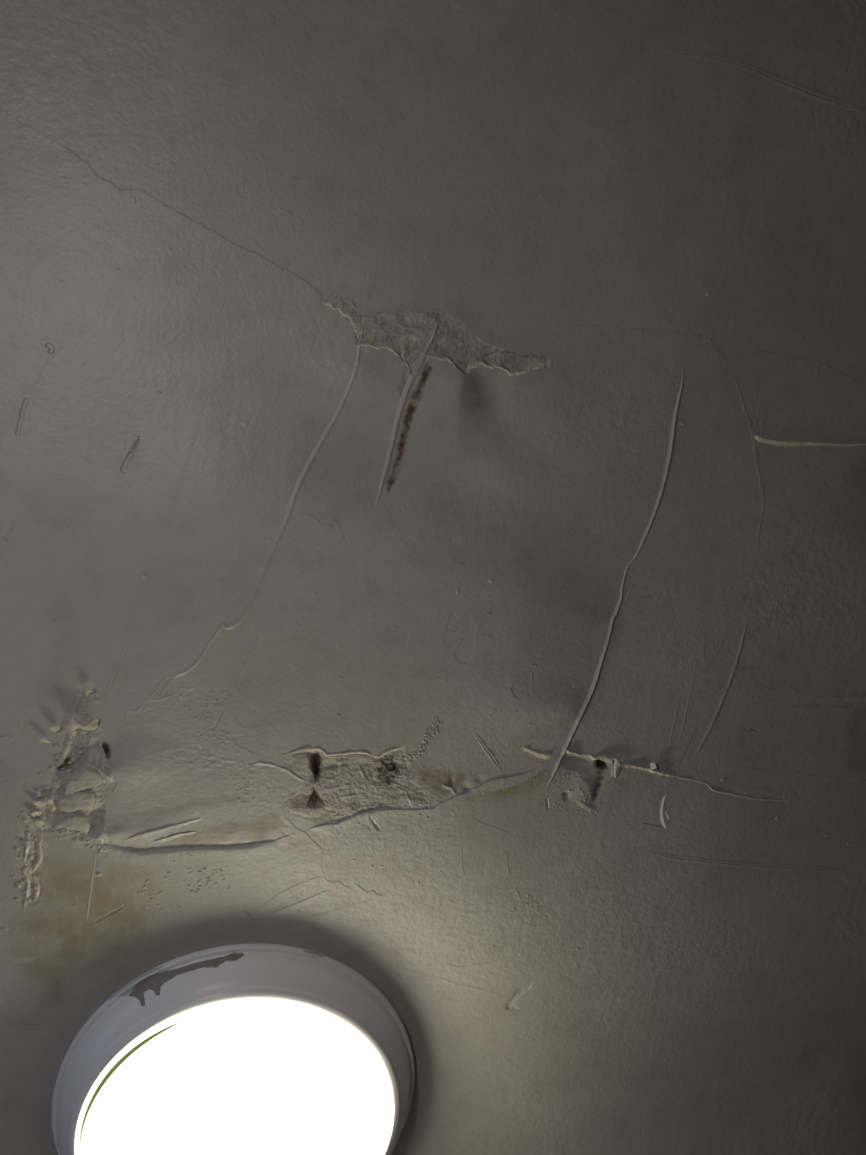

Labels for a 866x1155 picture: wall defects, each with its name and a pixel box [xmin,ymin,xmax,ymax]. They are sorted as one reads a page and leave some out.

crack [121,295,366,724]
crack [372,310,442,516]
flaking render [251,717,496,838]
crack [91,360,685,870]
flaking render [541,743,800,836]
crack [692,612,749,760]